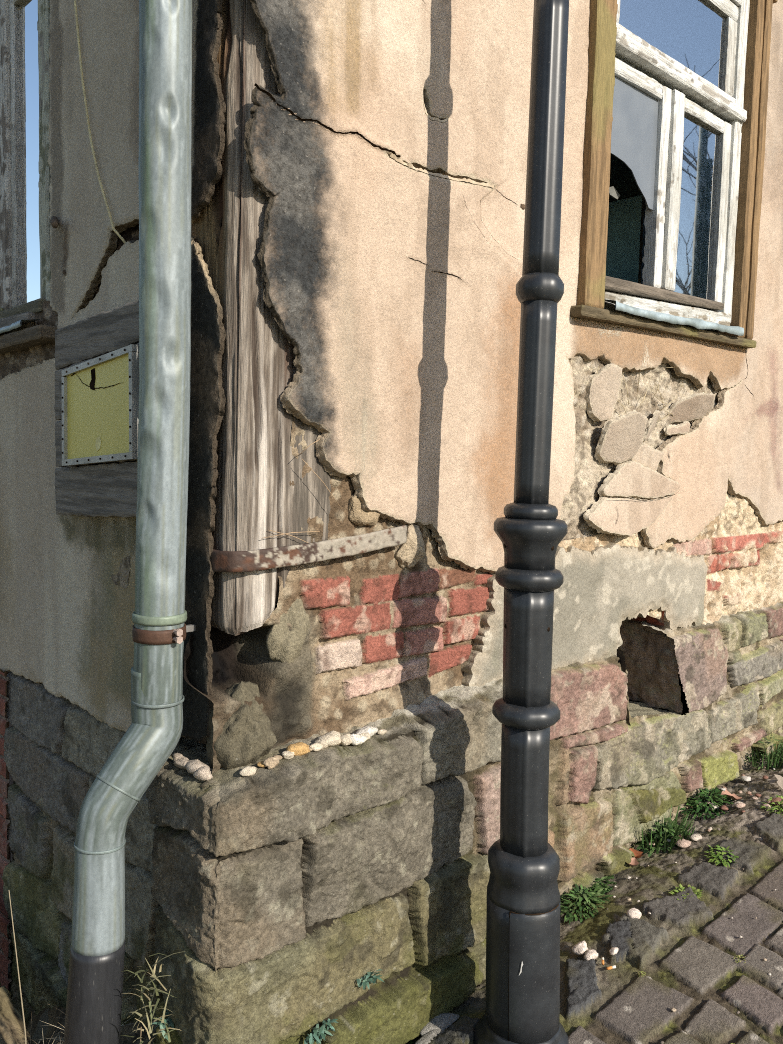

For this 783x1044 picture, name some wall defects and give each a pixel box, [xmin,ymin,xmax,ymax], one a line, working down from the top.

crack [54,219,139,318]
water stain [191,0,220,215]
crack [195,219,222,245]
water stain [251,0,335,424]
water stain [346,0,360,106]
crack [254,83,519,260]
flaking render [184,0,496,773]
flaking render [558,353,783,625]